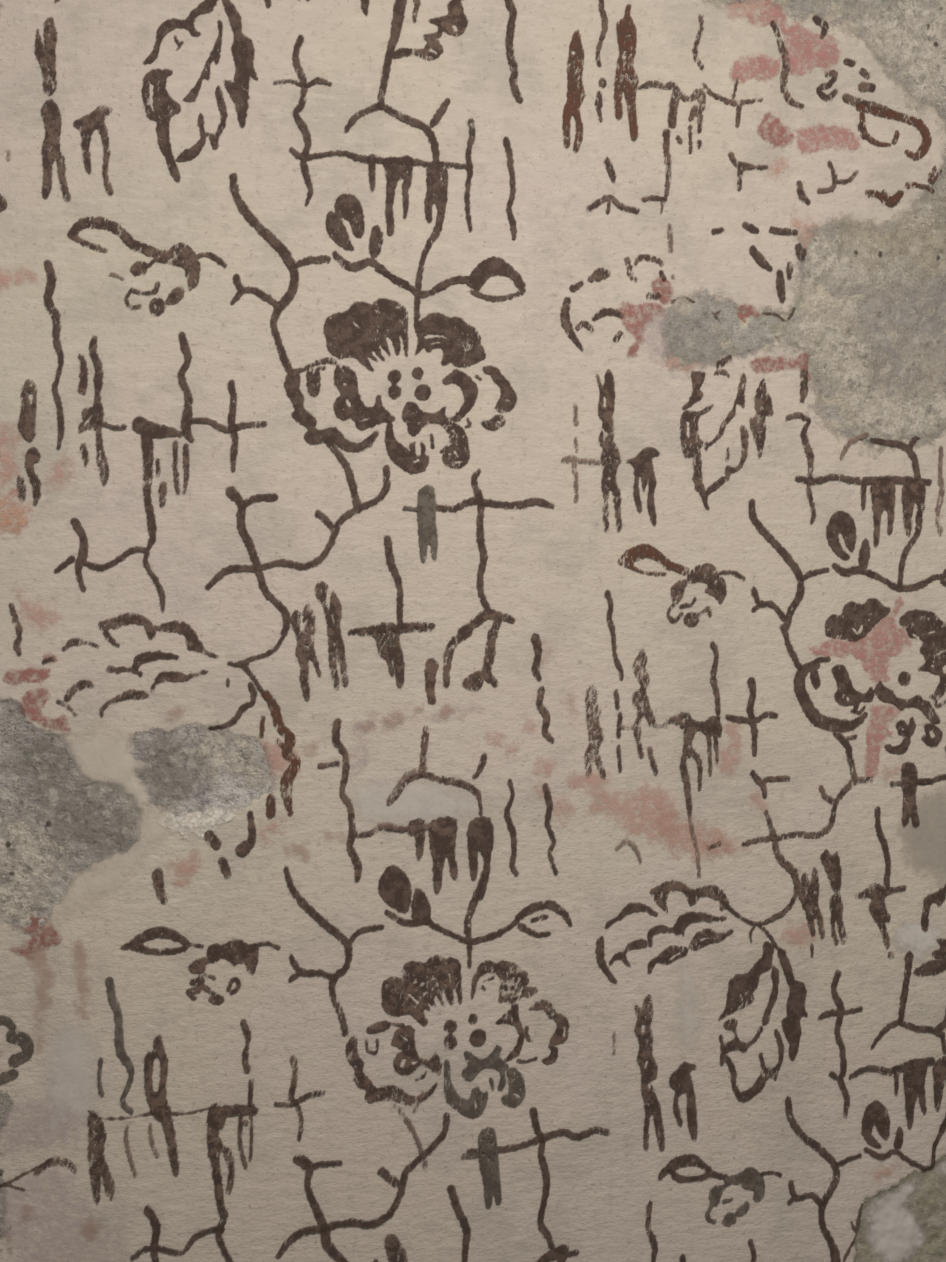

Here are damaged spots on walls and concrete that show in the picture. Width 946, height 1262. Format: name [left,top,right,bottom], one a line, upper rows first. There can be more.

flaking render [707,0,946,127]
flaking render [620,164,946,452]
flaking render [0,655,293,958]
flaking render [0,1093,13,1130]
flaking render [854,1156,946,1262]